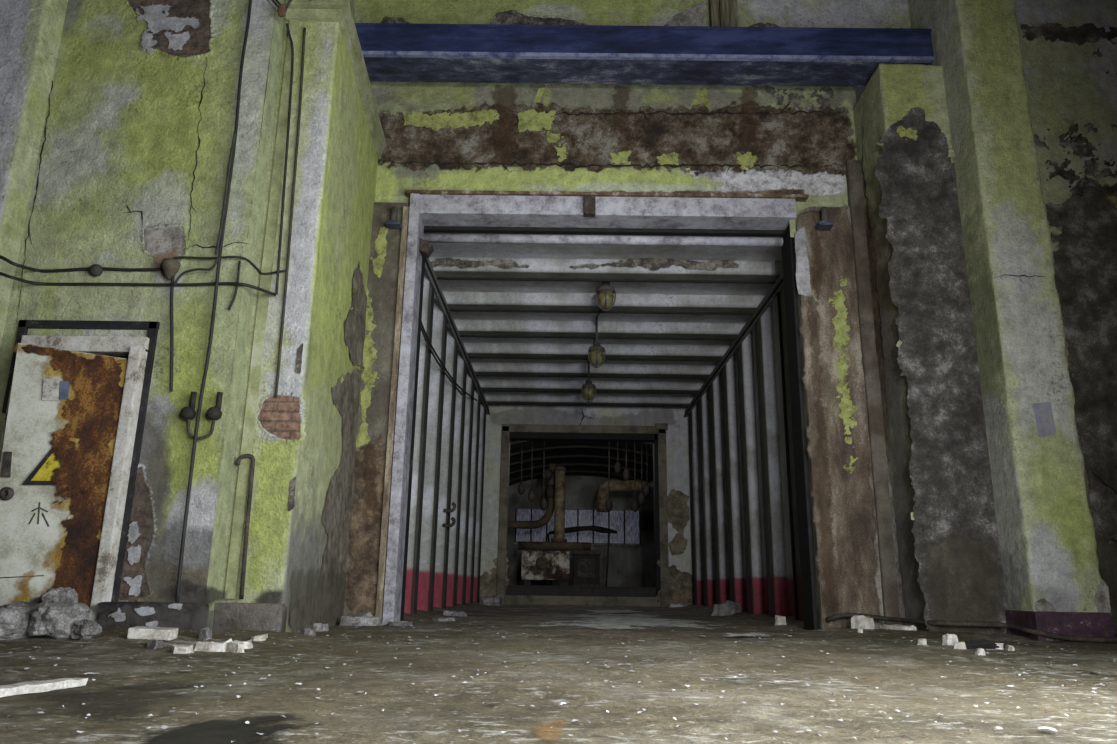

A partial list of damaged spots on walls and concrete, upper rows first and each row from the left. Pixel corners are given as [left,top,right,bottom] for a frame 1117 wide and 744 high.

flaking render [121,0,216,62]
flaking render [1018,21,1117,57]
rust [378,102,857,176]
peeling [1034,122,1117,549]
flaking render [256,390,306,446]
rust [798,207,881,629]
rust [11,344,128,612]
flaking render [118,462,160,602]
rust [344,436,393,616]
peeling [656,489,694,607]
spalling [1094,580,1111,613]
damp [1096,542,1117,636]